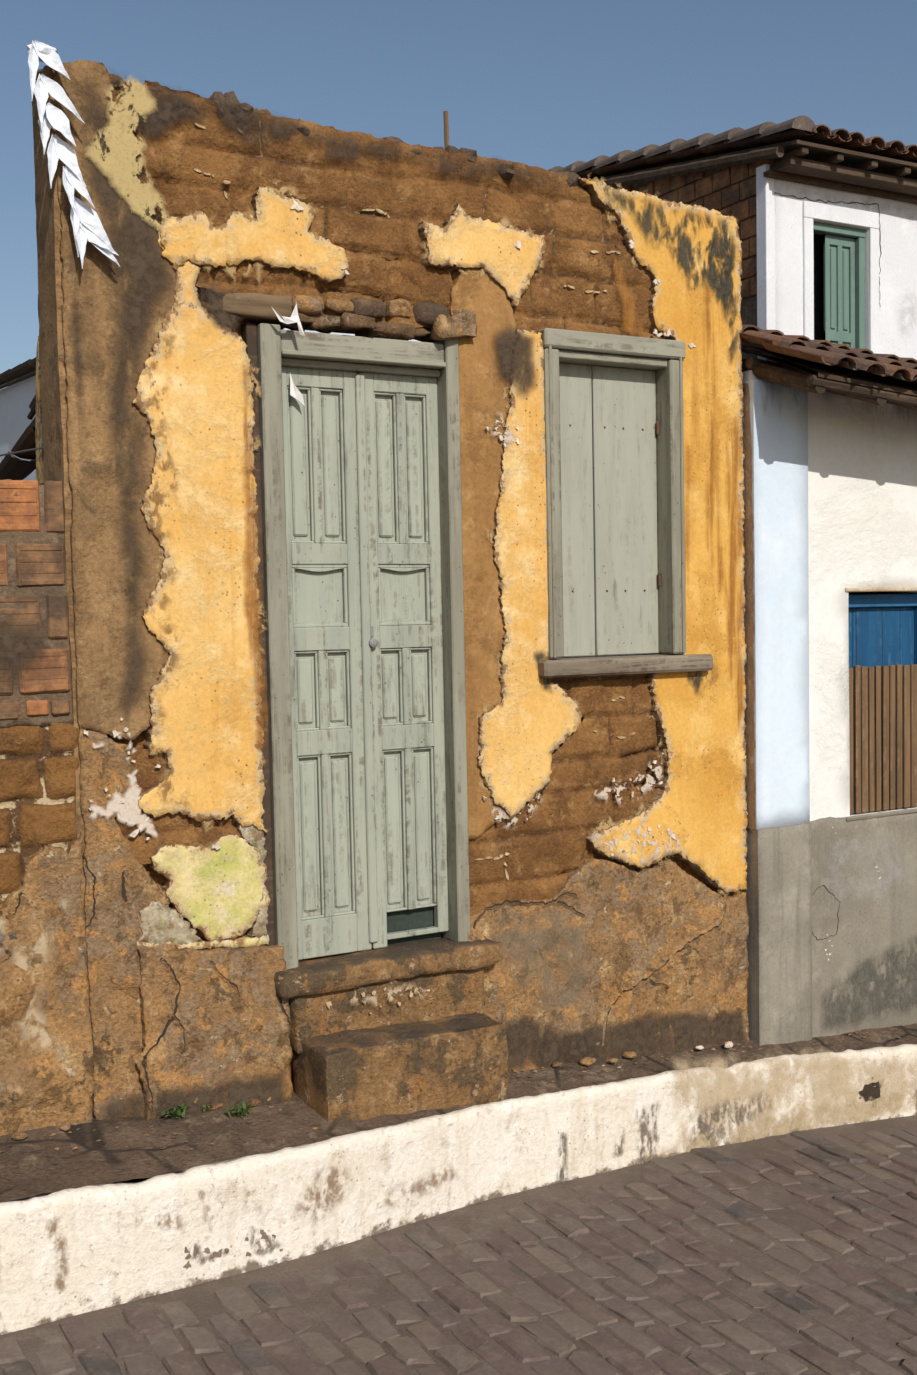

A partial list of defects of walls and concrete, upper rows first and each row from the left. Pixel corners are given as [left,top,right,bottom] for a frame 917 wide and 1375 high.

peeling [86,62,672,339]
leakage [613,192,738,360]
leakage [496,329,534,392]
peeling [486,385,520,447]
peeling [83,717,241,864]
peeling [469,673,680,916]
crack [83,853,128,928]
crack [473,892,586,928]
leakage [825,947,917,1027]